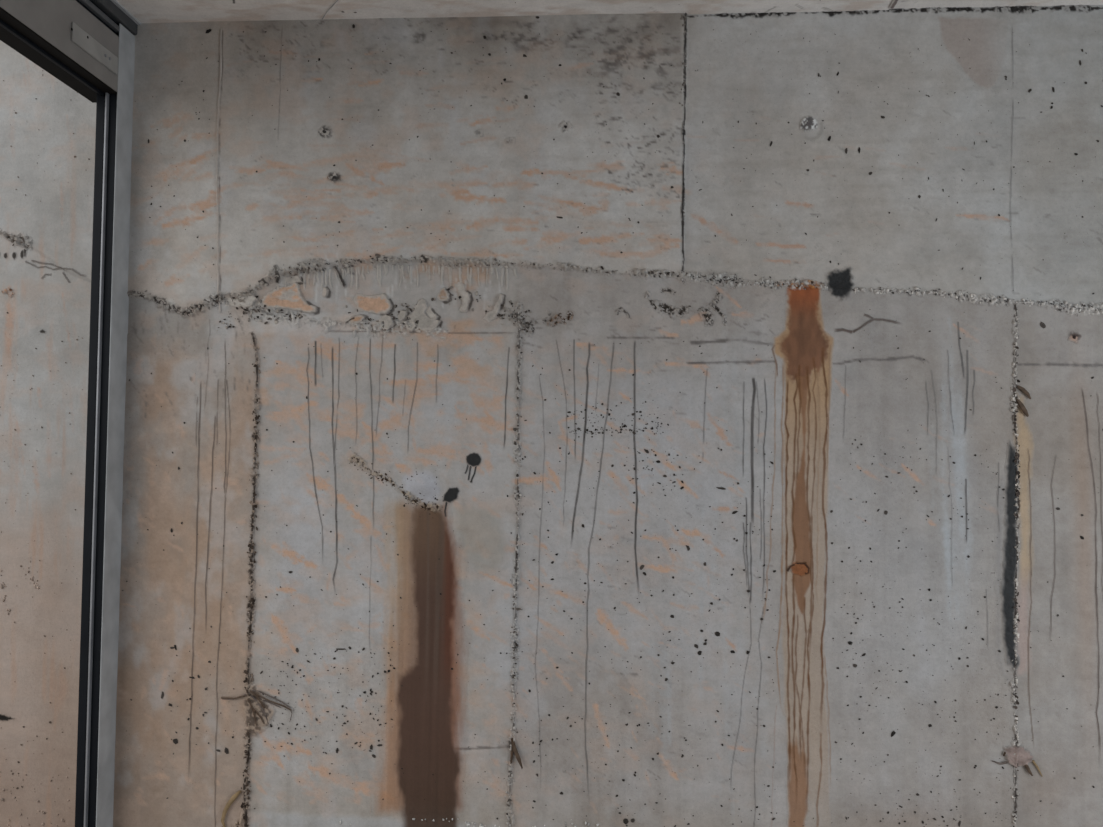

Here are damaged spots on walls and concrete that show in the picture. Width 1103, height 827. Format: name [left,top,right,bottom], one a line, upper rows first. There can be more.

crack [215,28,225,314]
crack [241,331,262,827]
leakage [306,334,472,827]
peeling [127,253,828,343]
crack [459,302,525,827]
corrosion [759,279,835,827]
crack [679,0,1103,827]
spalling [852,286,1103,318]